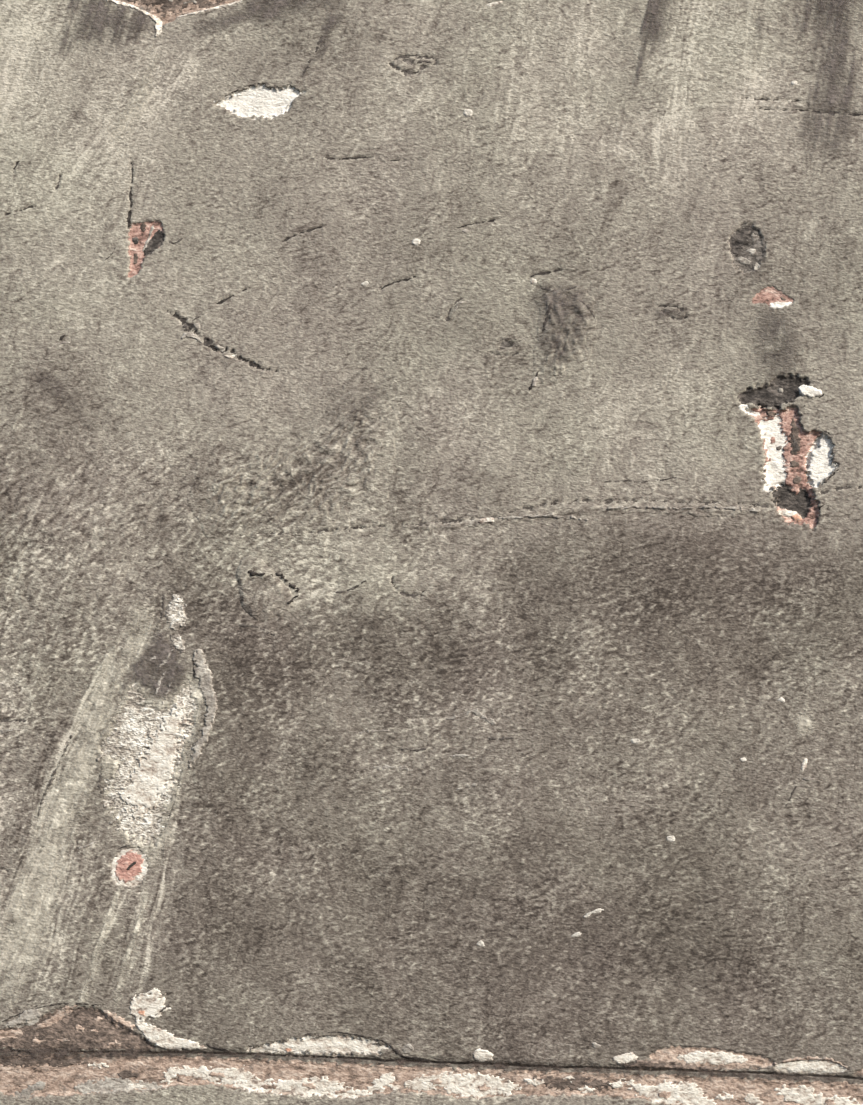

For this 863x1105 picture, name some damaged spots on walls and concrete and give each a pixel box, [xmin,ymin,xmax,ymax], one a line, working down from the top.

water stain [637,0,666,76]
spalling [213,83,306,120]
crack [741,97,863,116]
water stain [804,0,855,147]
crack [167,289,277,372]
spalling [737,373,839,531]
crack [256,477,773,535]
corrosion [111,844,151,888]
water stain [80,889,120,1003]
water stain [126,893,147,959]
spalling [0,988,231,1053]
spalling [247,1032,433,1063]